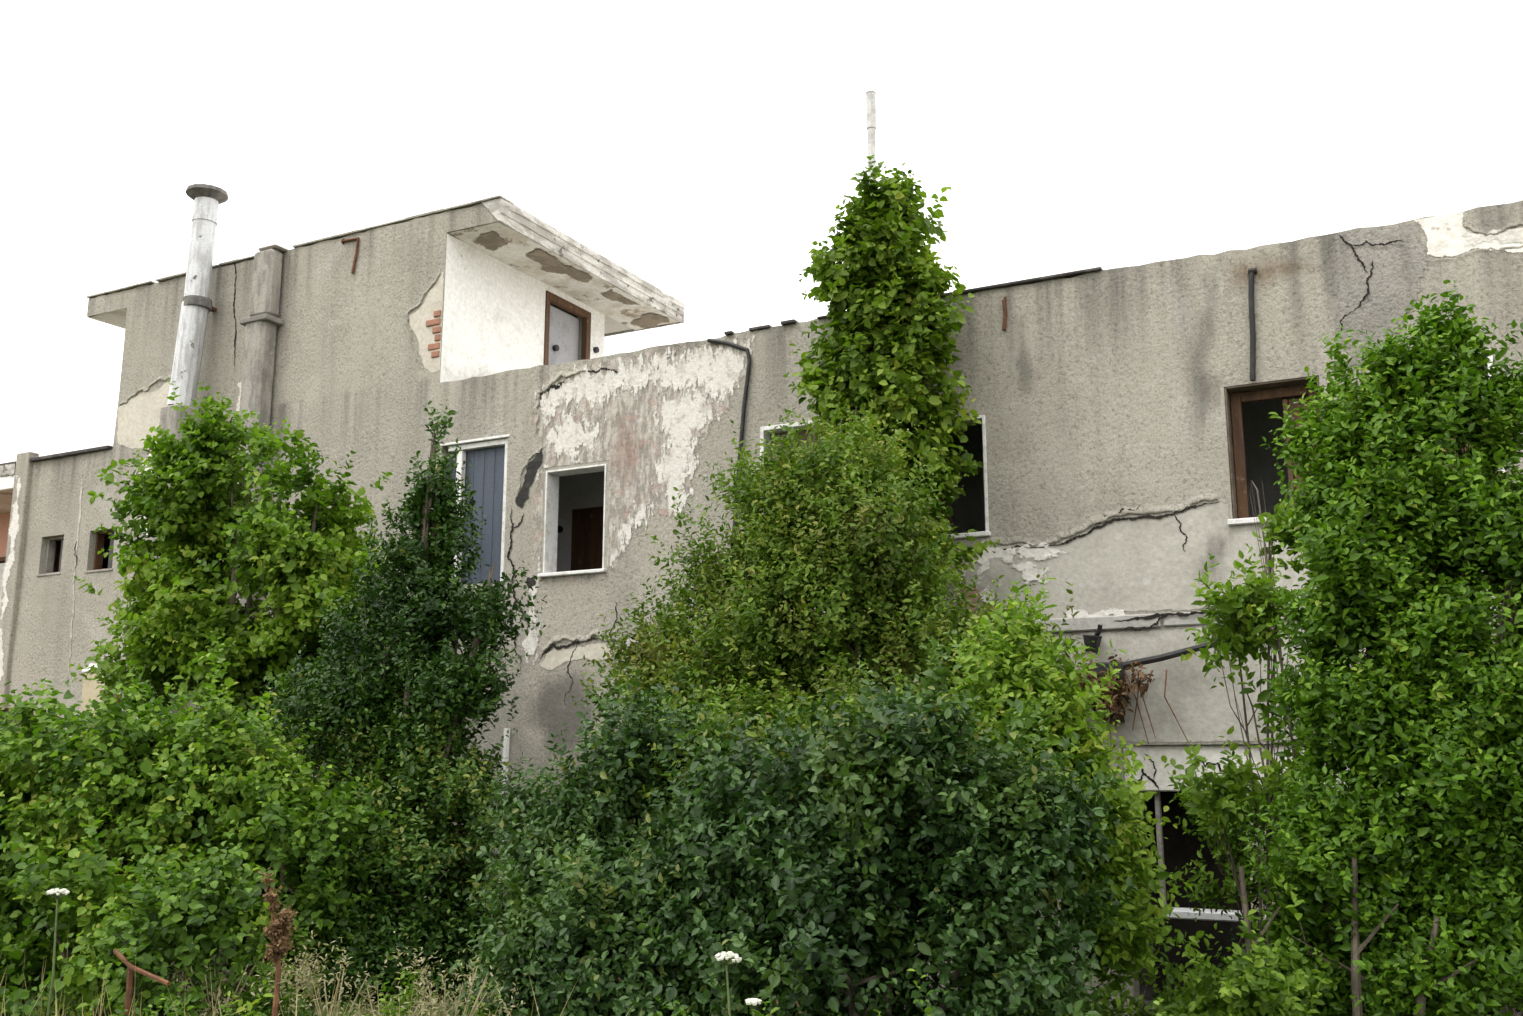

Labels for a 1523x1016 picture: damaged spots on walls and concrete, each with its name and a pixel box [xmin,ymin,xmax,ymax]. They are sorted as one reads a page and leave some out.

spalling [405,270,444,373]
crack [1339,235,1403,331]
flaking render [1414,211,1523,266]
peeling [514,333,757,665]
crack [975,501,1220,557]
spalling [958,493,1316,622]